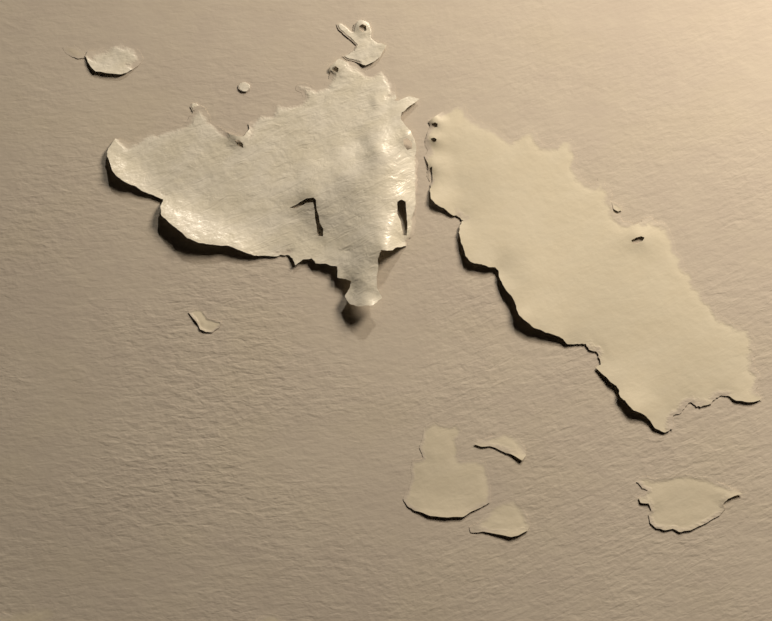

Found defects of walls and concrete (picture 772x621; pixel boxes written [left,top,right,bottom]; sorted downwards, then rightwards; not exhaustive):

peeling [85,39,143,74]
peeling [107,20,761,432]
peeling [403,422,530,537]
peeling [637,474,742,532]